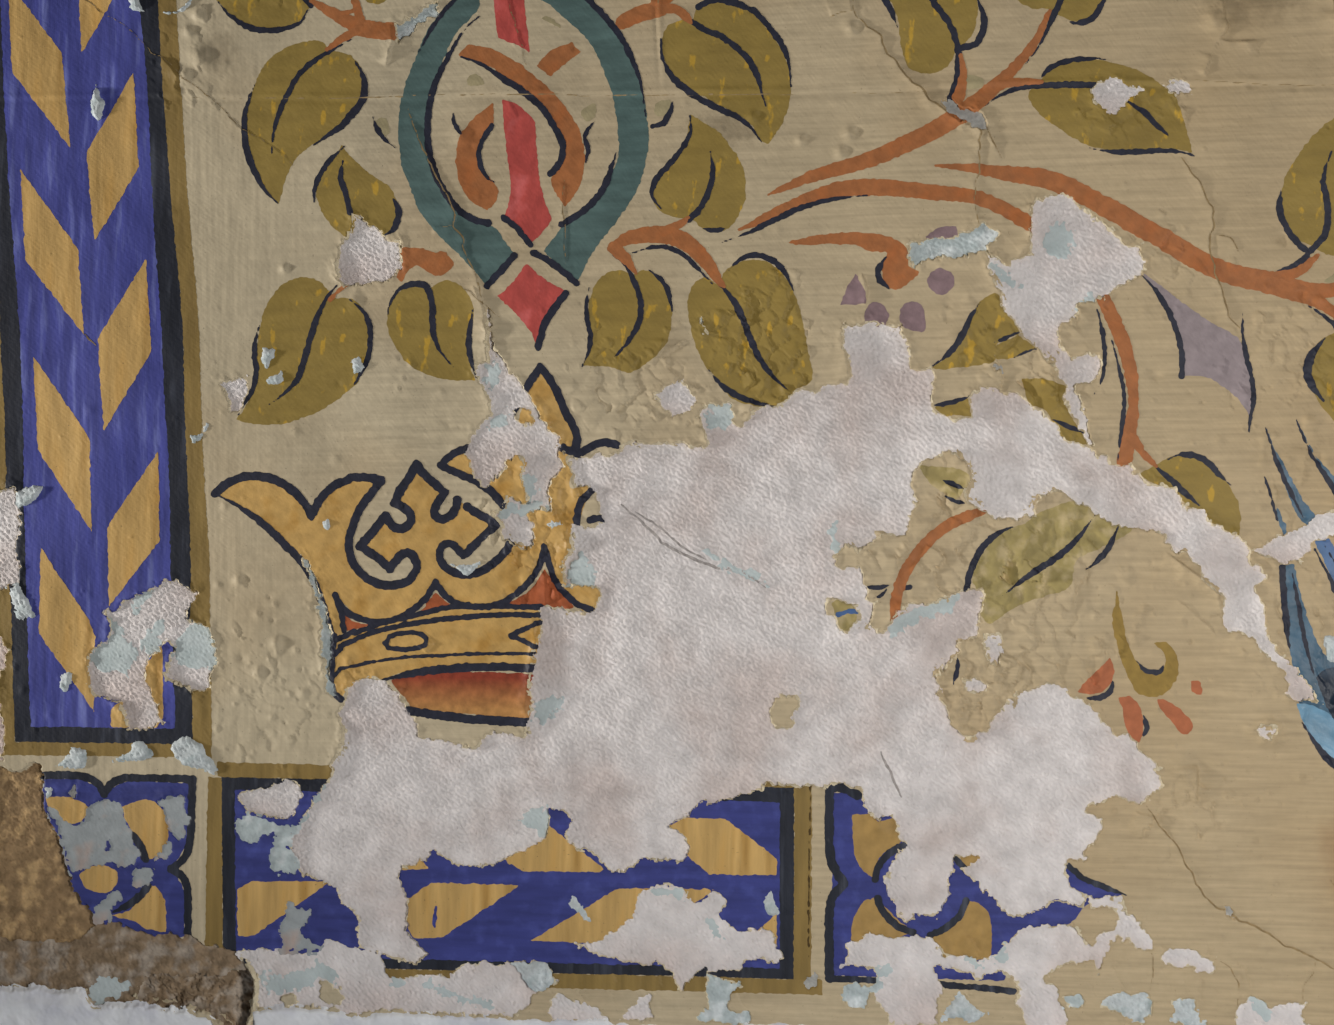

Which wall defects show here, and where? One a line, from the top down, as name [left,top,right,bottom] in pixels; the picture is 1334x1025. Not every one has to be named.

peeling [220,376,249,413]
peeling [190,423,209,443]
peeling [0,485,43,620]
peeling [1252,509,1334,565]
peeling [235,192,1319,1025]
peeling [0,636,10,671]
peeling [60,578,218,763]
peeling [1323,635,1334,662]
peeling [58,747,87,798]
peeling [171,736,218,775]
peeling [0,763,559,1025]
crack [1148,809,1334,985]